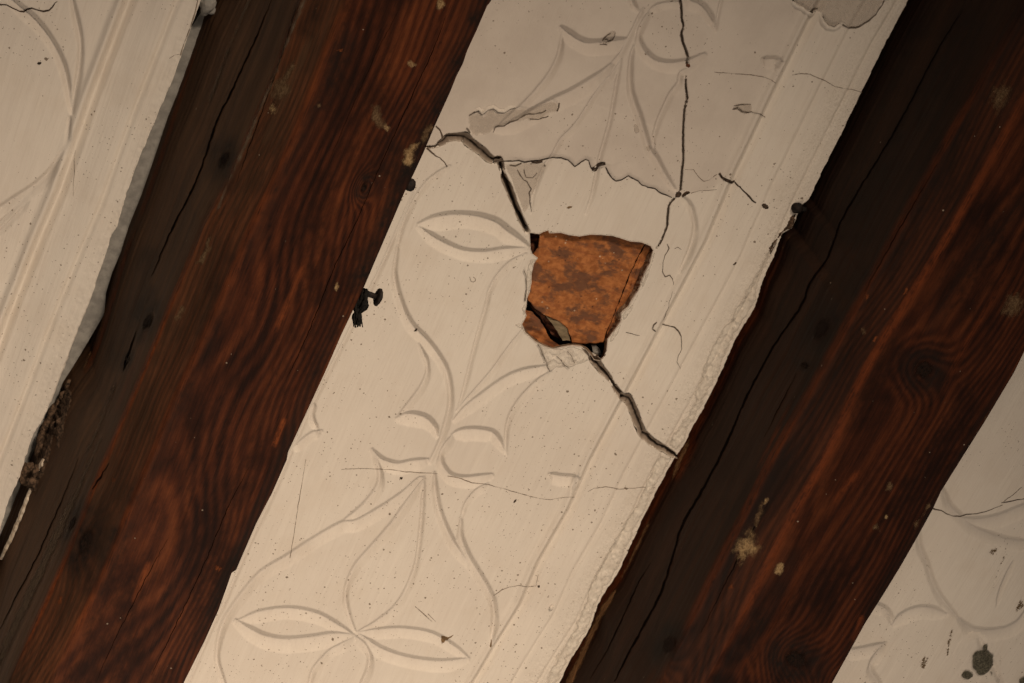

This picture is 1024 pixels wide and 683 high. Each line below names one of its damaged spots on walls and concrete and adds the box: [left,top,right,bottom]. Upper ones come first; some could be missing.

peeling [790,0,884,32]
peeling [466,103,560,133]
crack [426,126,529,231]
crack [626,0,756,369]
flaking render [517,230,654,372]
crack [582,347,678,458]
spalling [548,214,796,683]
leakage [962,645,993,679]